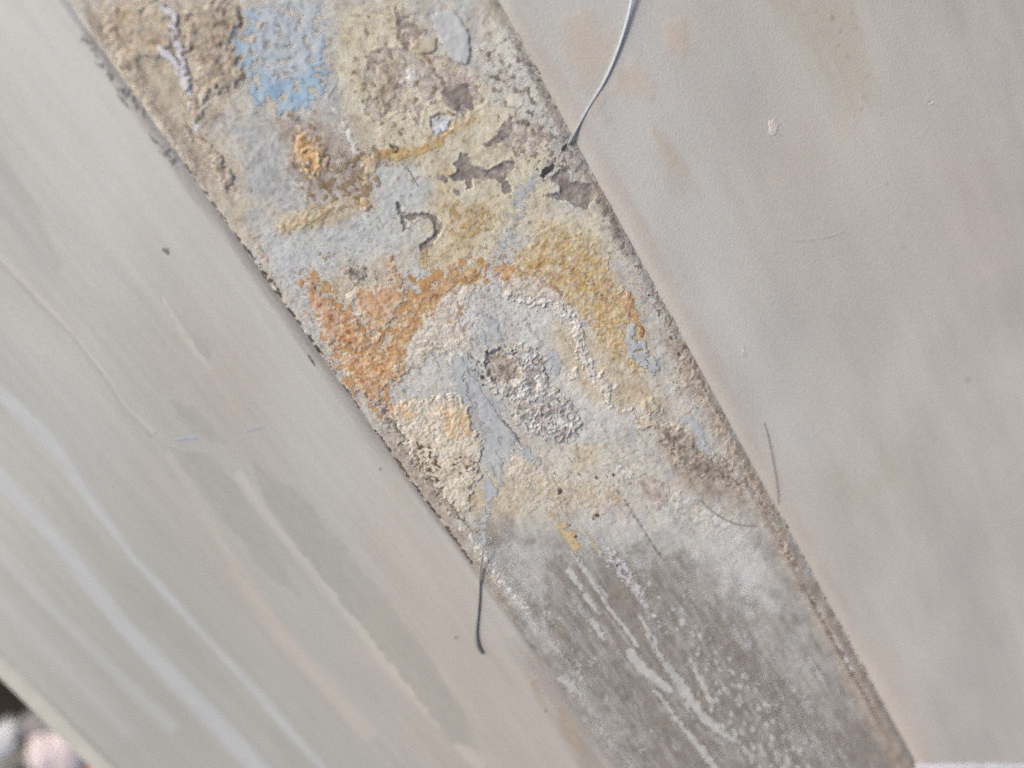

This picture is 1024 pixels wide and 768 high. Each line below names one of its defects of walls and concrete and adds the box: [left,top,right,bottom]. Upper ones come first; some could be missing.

spalling [80,34,182,170]
peeling [350,7,636,277]
rust [356,328,386,360]
rust [387,343,458,405]
peeling [616,322,660,376]
peeling [448,296,562,555]
rust [349,390,481,575]
peeling [602,459,685,521]
rust [757,483,772,508]
leakage [591,533,668,633]